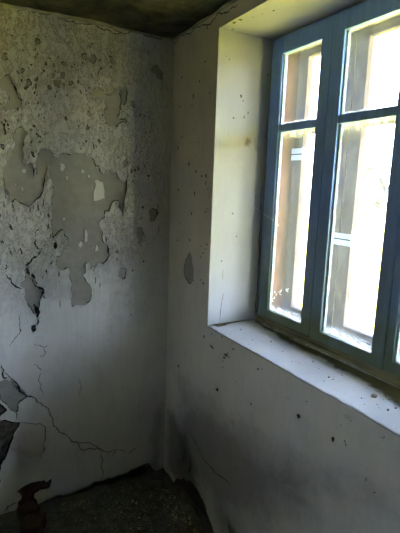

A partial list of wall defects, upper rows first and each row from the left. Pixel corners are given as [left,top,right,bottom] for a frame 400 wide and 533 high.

peeling [0,34,136,320]
peeling [0,378,29,501]
crack [1,364,135,481]